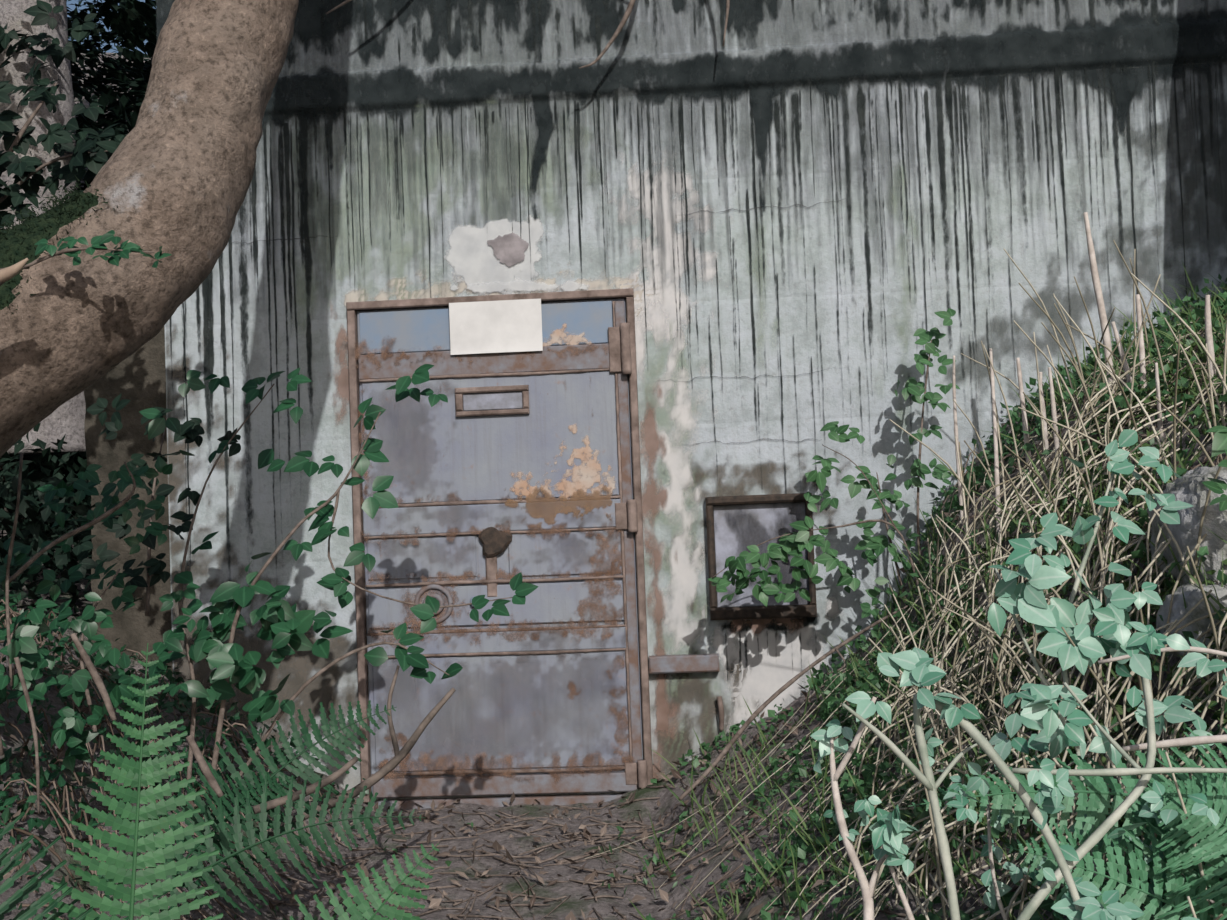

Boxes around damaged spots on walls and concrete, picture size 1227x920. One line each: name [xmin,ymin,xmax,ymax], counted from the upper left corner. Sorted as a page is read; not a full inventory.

damp [156,0,175,40]
peeling [446,215,588,295]
damp [170,0,1227,728]
corrosion [641,408,667,517]
corrosion [645,535,665,656]
corrosion [379,690,634,785]
corrosion [652,673,677,780]